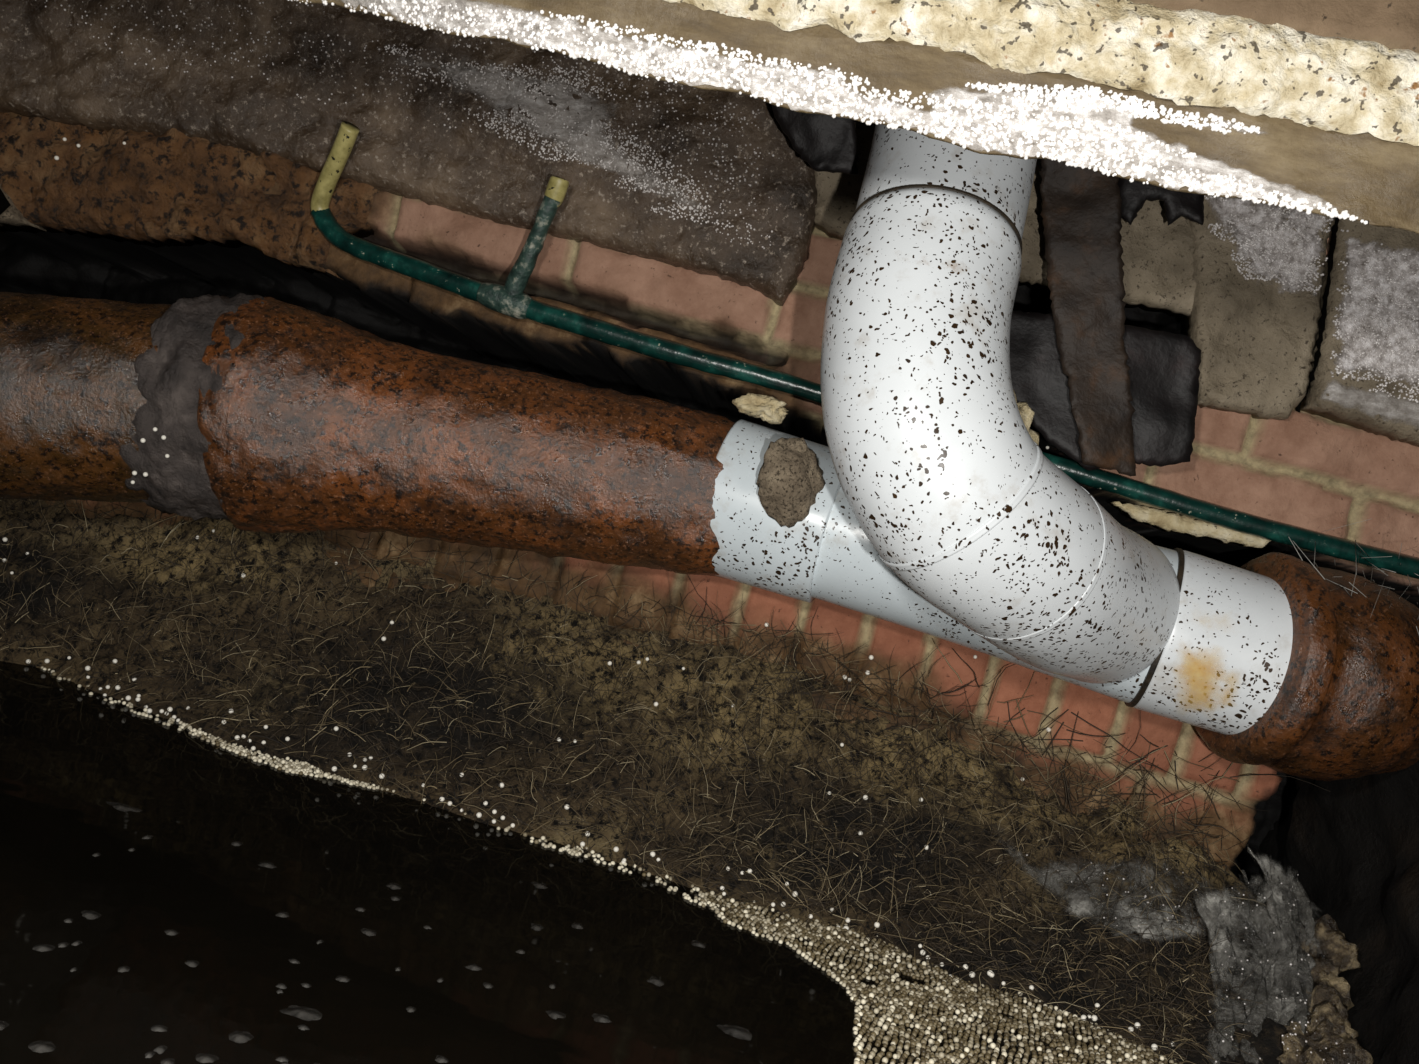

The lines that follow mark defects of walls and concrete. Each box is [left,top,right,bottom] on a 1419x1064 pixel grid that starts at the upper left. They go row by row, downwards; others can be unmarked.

crack [0,189,11,215]
leakage [35,0,1419,427]